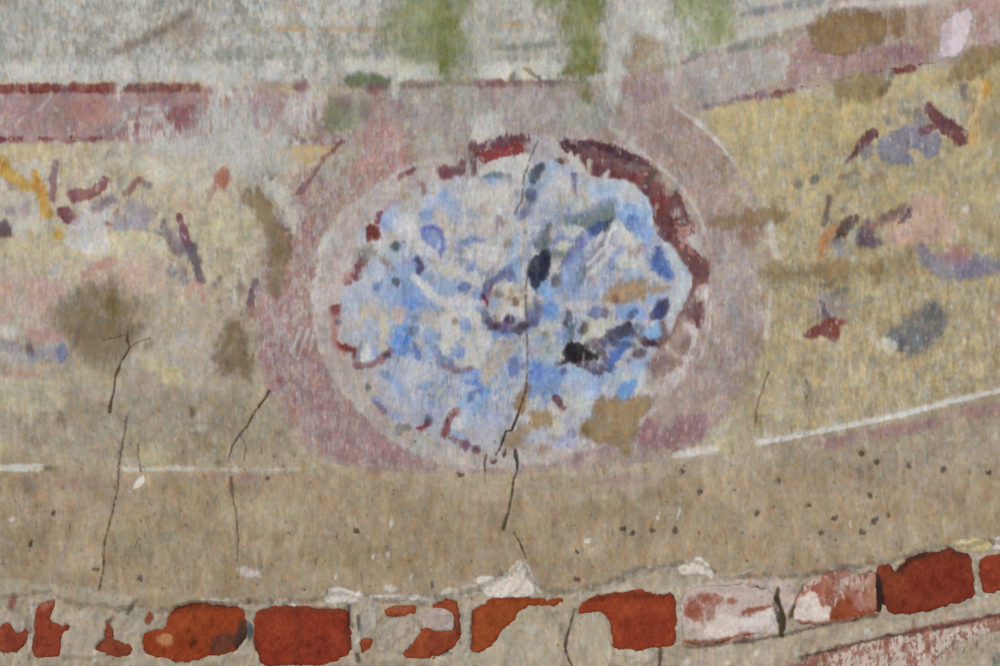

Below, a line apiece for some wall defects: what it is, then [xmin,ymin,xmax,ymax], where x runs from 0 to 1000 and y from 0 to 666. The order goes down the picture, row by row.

crack [484,264,530,558]
crack [99,335,142,589]
crack [229,390,270,555]
flaking render [0,583,70,658]
flaking render [92,596,563,666]
flaking render [579,565,775,666]
flaking render [789,548,1000,625]
flaking render [801,616,1000,666]